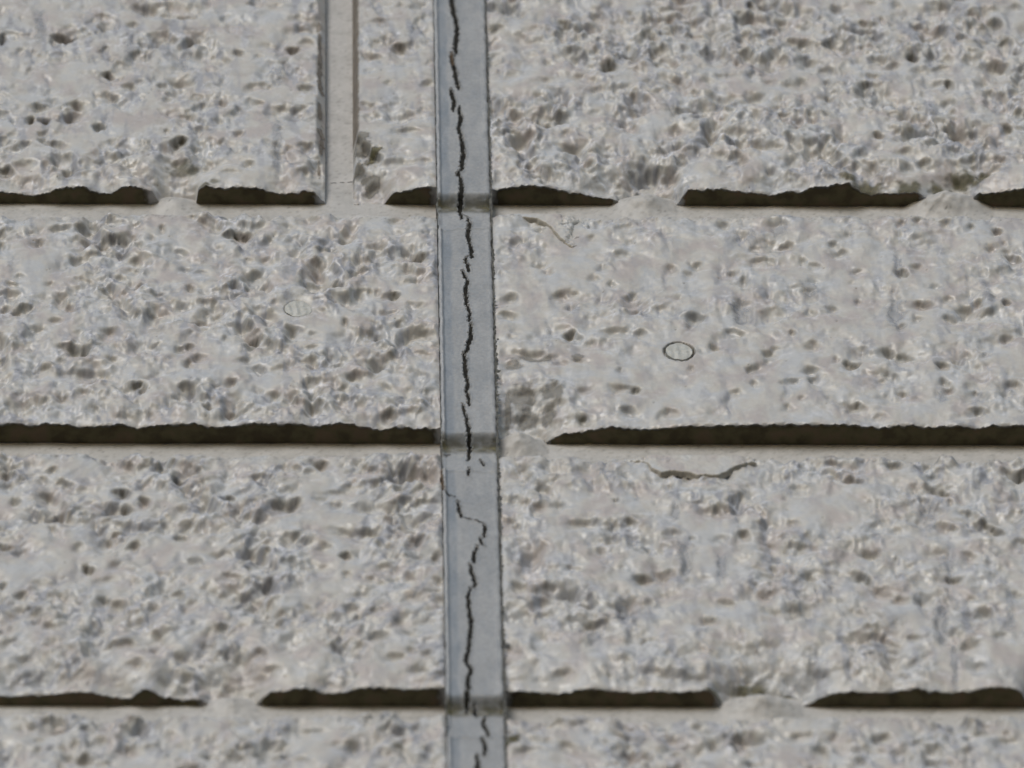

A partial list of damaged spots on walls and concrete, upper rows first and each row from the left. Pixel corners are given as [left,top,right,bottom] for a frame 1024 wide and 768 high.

crack [433,0,510,768]